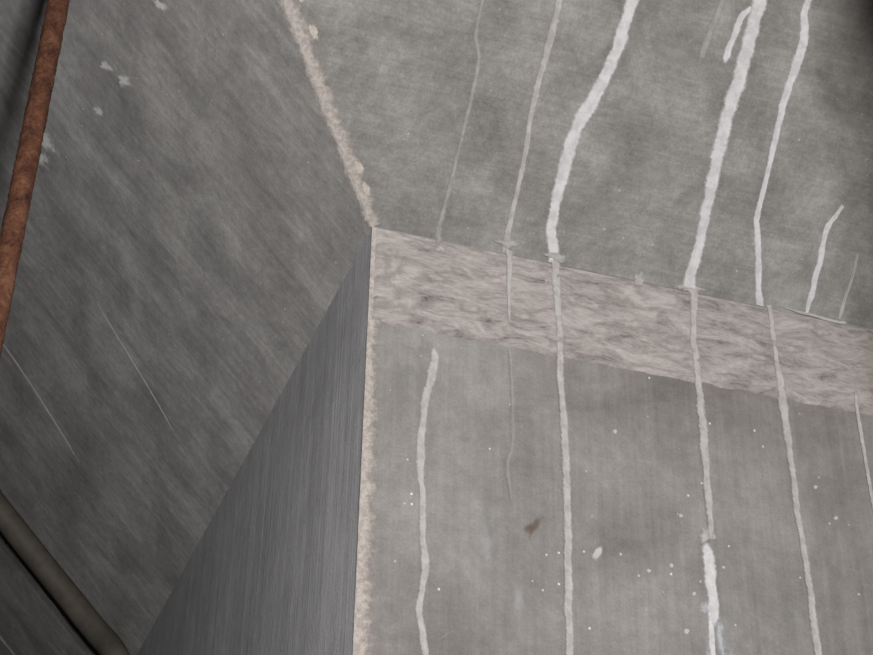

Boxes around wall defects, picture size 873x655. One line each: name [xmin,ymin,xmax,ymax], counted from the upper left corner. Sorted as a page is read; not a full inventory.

water stain [675,0,767,655]
water stain [754,0,822,655]
crack [782,253,858,324]
water stain [805,205,844,313]